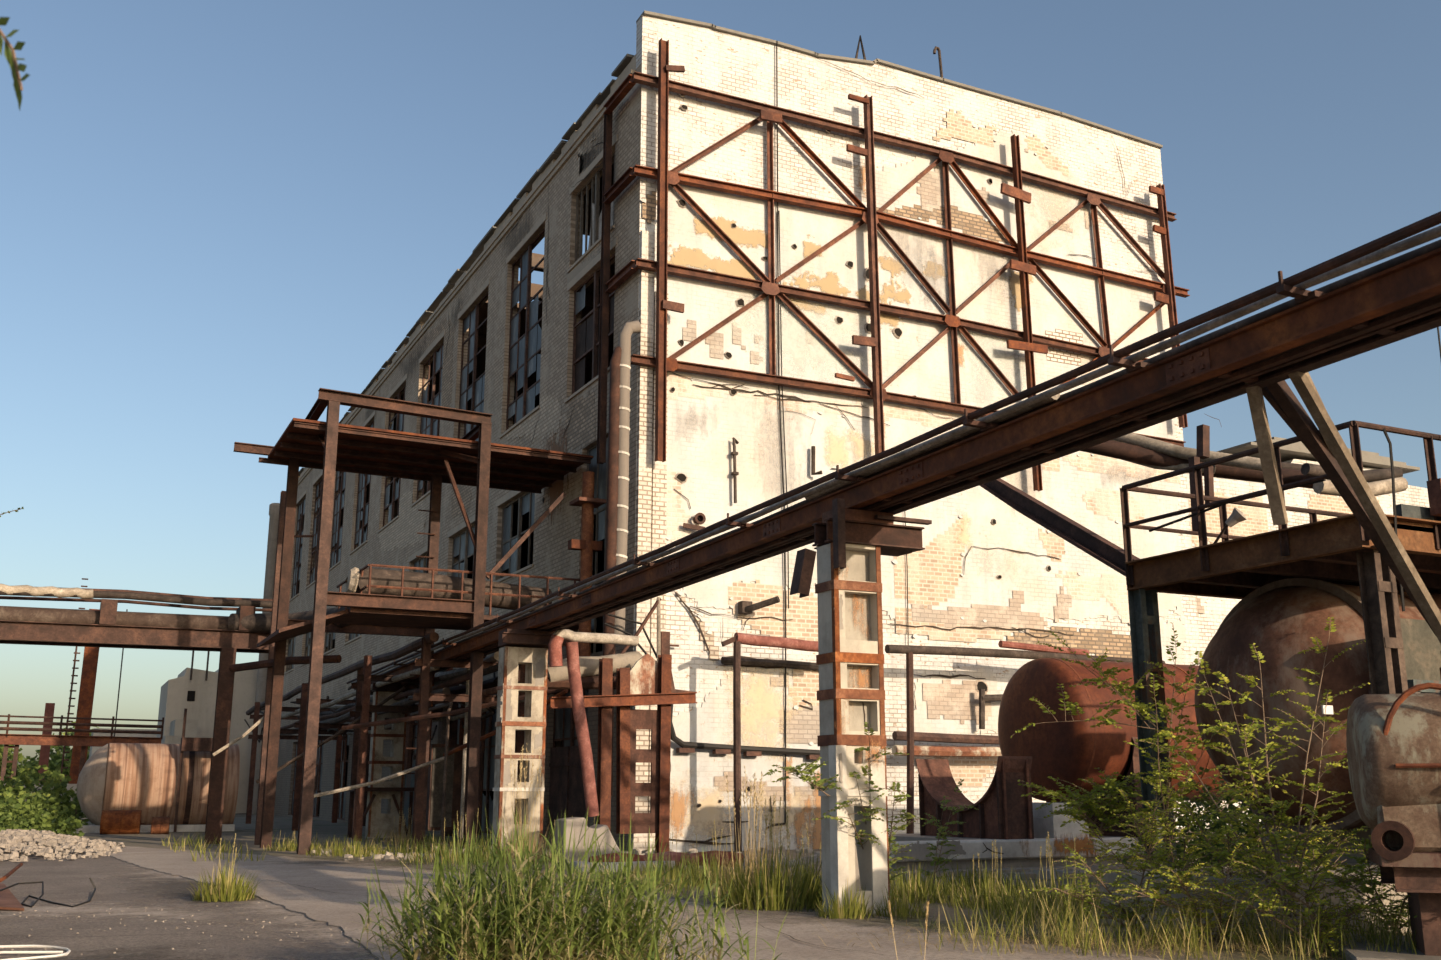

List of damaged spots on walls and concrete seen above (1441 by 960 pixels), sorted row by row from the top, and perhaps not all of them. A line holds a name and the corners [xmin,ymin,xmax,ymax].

flaking render [933,108,997,148]
spalling [846,261,869,281]
flaking render [892,515,1132,658]
corrosion [853,667,872,688]